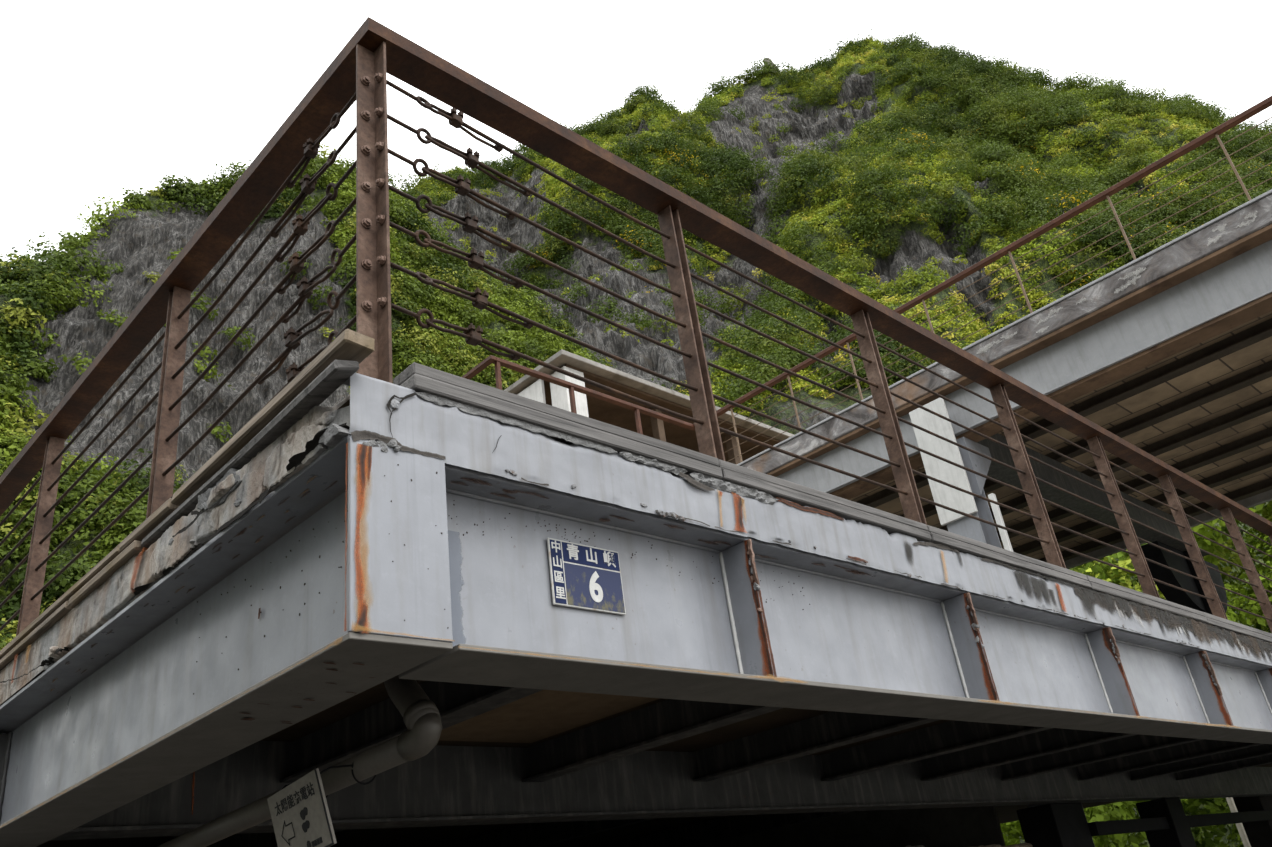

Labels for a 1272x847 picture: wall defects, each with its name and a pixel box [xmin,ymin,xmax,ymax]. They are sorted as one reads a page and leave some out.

crack [386,393,416,438]
spalling [149,411,446,577]
rust [812,556,869,575]
rust [1,442,807,827]
rust [964,592,1112,715]
rust [1103,627,1241,728]